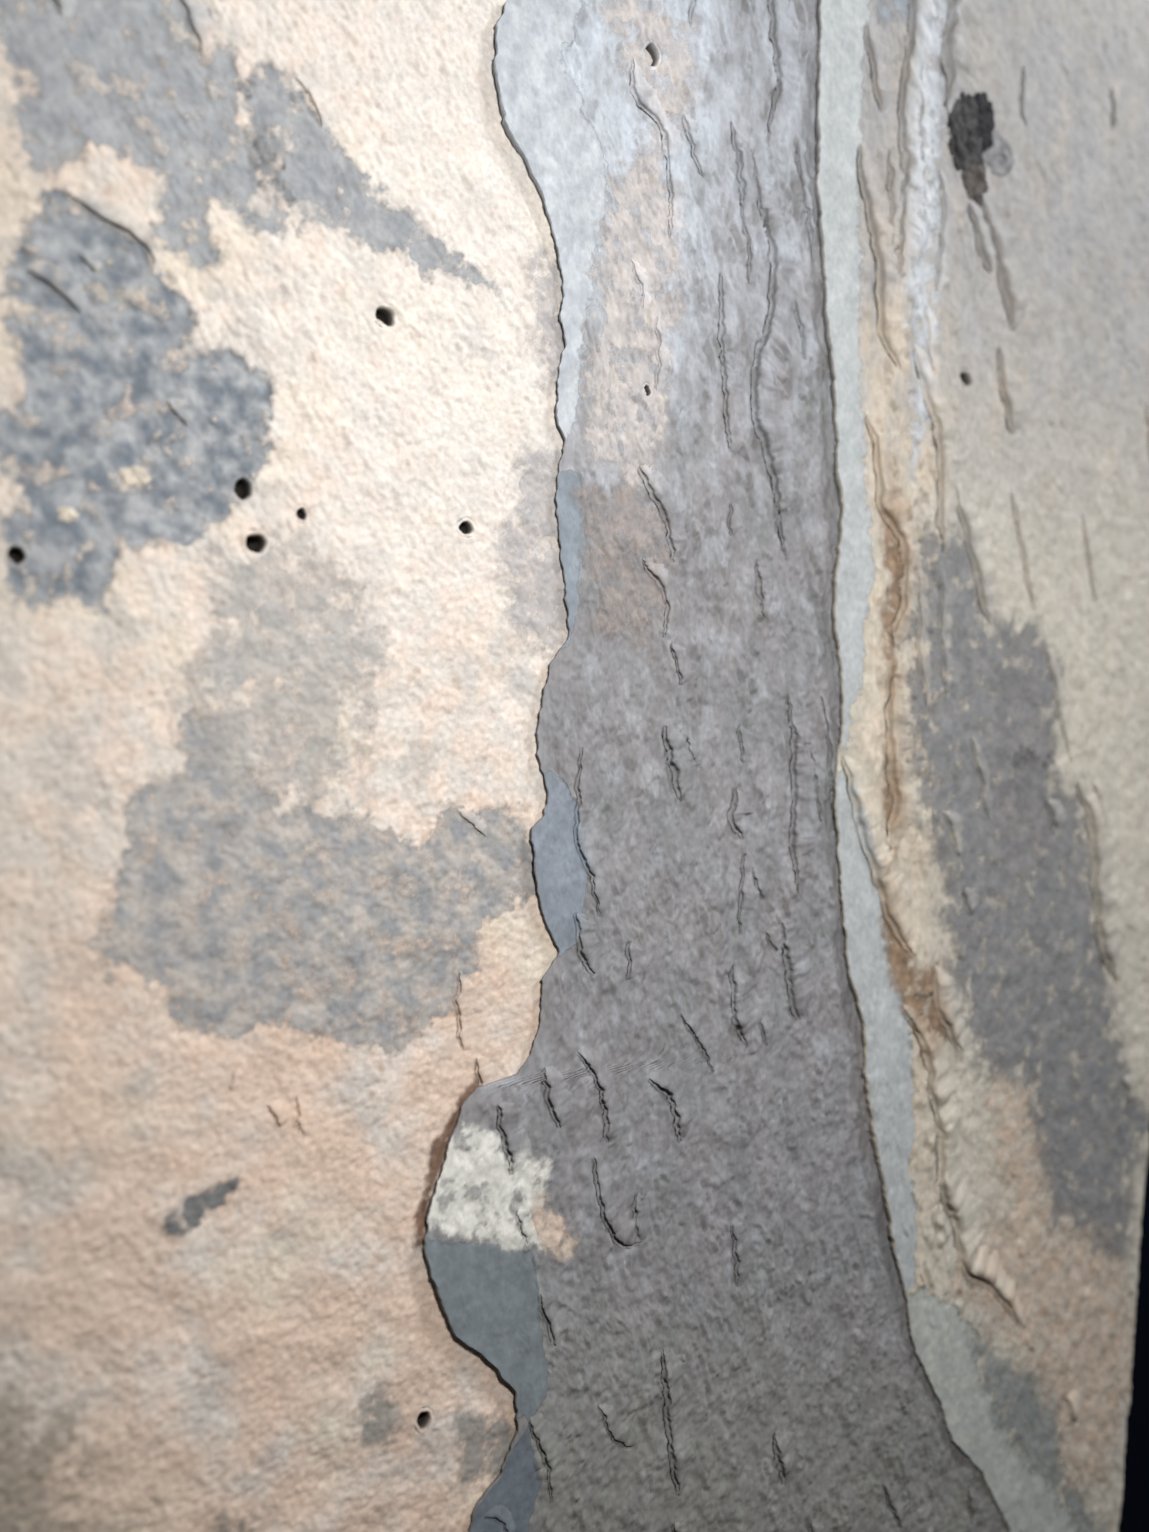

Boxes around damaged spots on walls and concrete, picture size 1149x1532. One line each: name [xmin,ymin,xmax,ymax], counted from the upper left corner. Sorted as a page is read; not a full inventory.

crack [1109,89,1122,130]
crack [1141,403,1149,443]
crack [1082,513,1102,599]
crack [454,0,1039,1330]
peeling [424,0,1149,1532]
crack [1045,646,1122,983]
crack [538,1292,569,1347]
spalling [414,1407,434,1435]
crack [1065,1389,1081,1424]